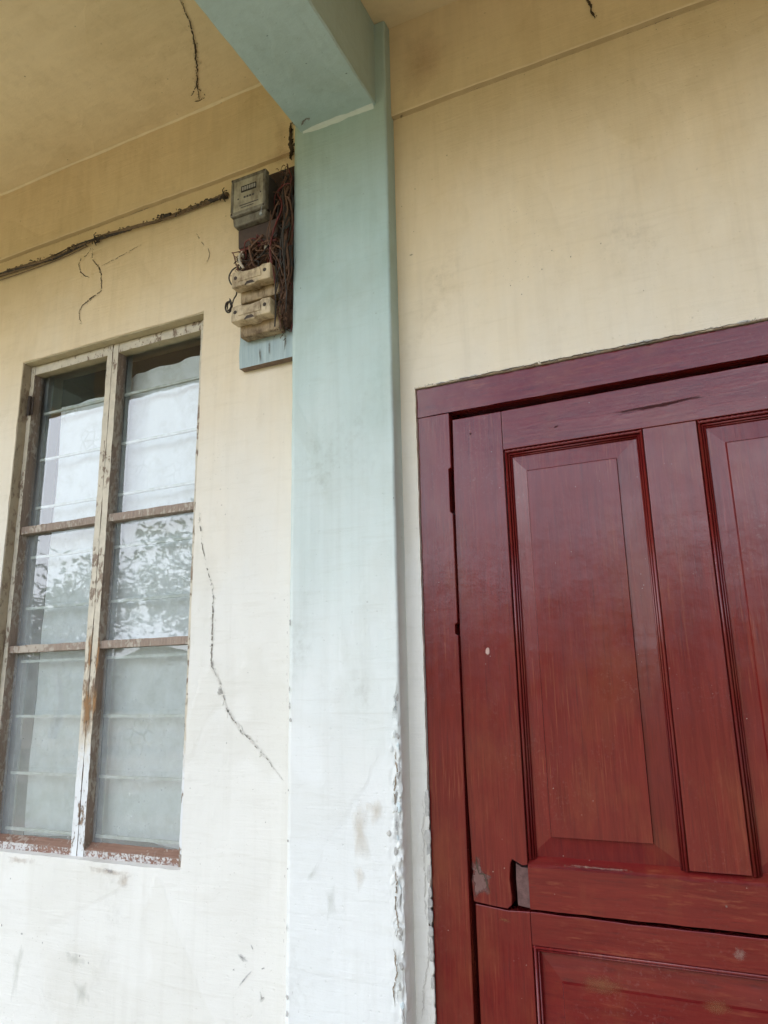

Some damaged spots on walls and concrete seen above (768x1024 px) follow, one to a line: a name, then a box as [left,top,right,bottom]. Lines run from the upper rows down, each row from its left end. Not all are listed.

crack [179,0,205,102]
crack [56,228,138,324]
crack [199,517,291,794]
spalling [386,683,405,1024]